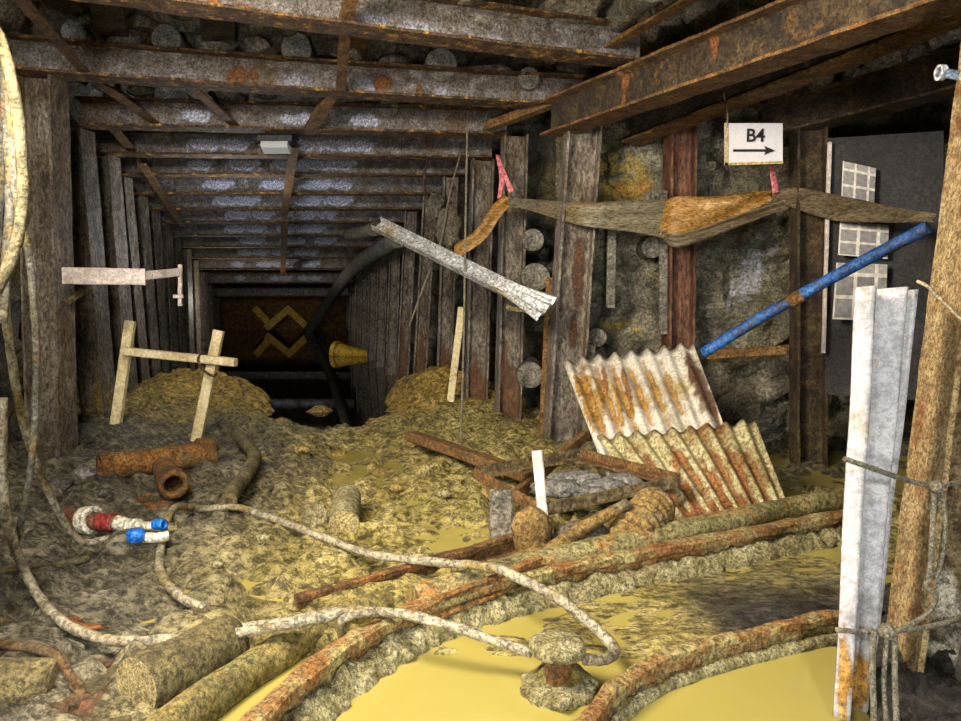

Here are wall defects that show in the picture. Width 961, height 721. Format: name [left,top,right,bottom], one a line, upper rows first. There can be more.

rust [687,32,719,60]
rust [613,66,634,104]
rust [573,362,682,435]
rust [685,354,720,428]
rust [666,444,771,520]
rust [835,635,869,720]